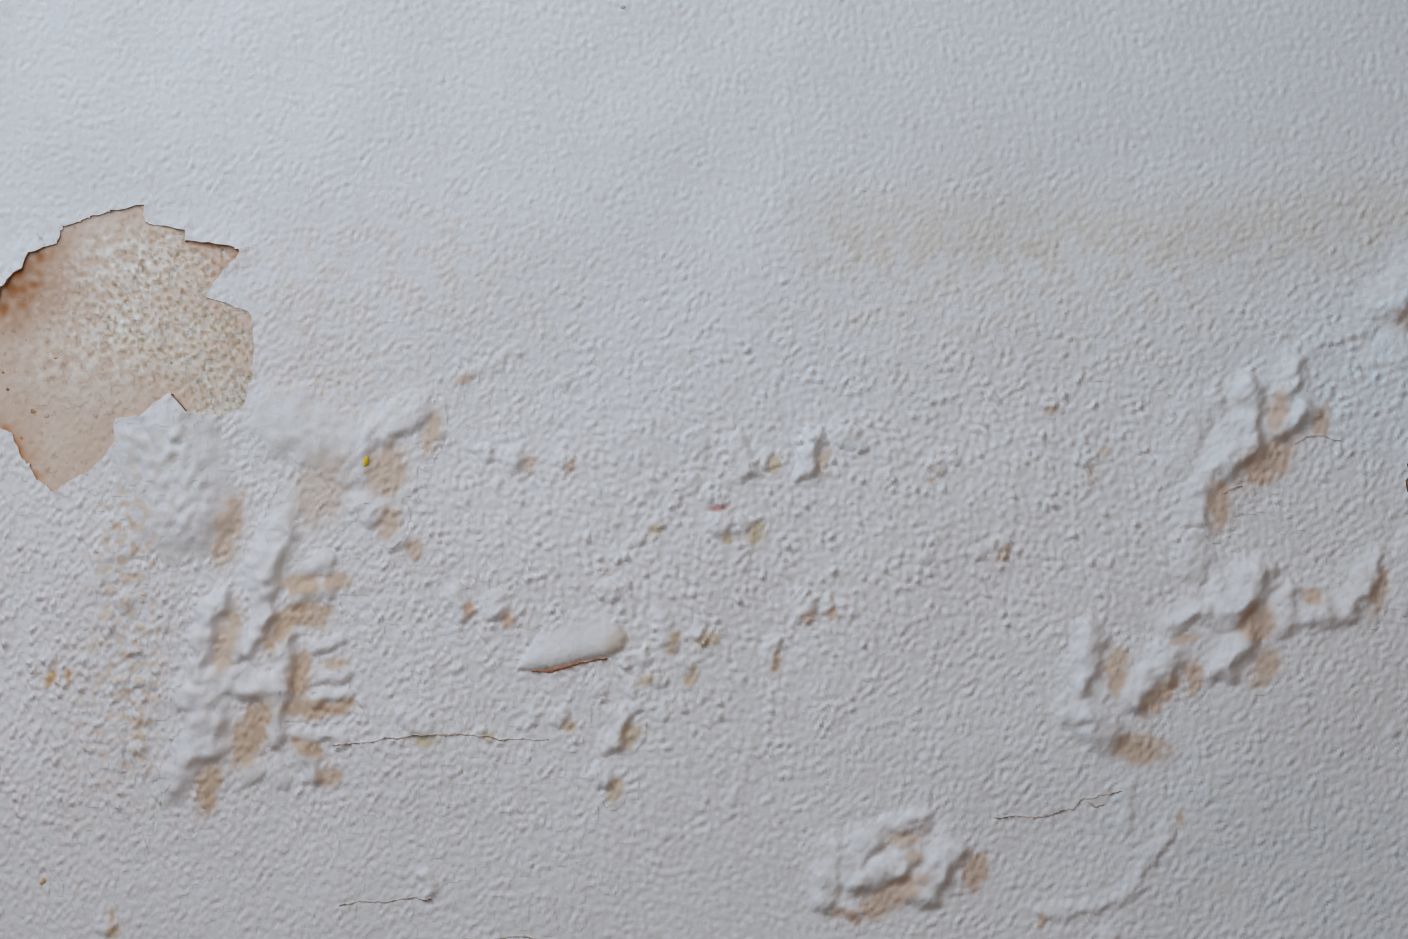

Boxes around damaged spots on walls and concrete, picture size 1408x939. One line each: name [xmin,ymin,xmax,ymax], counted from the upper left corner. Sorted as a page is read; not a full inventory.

peeling [0,190,263,491]